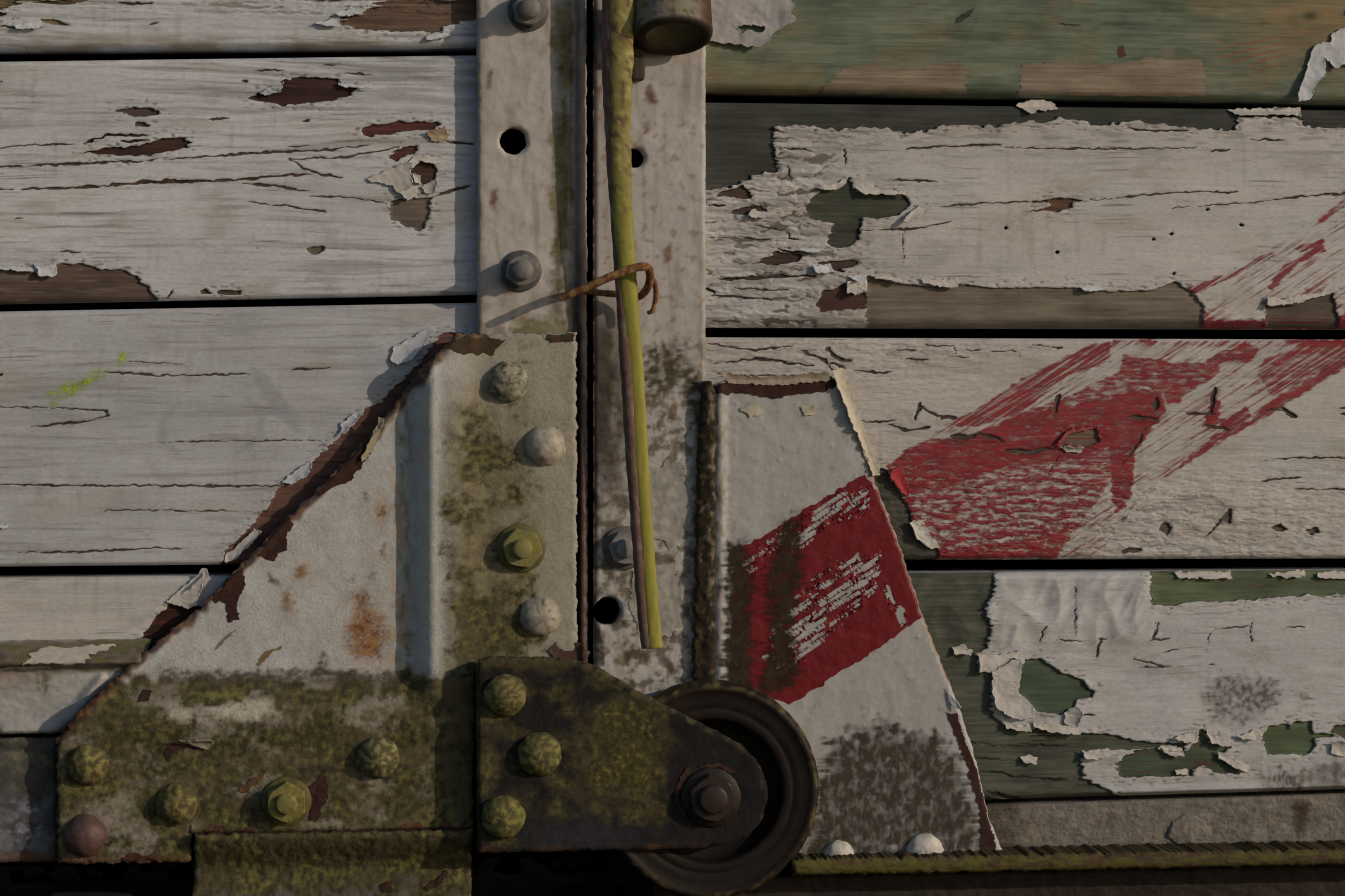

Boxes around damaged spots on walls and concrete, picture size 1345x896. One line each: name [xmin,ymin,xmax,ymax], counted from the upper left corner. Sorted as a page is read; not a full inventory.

peeling [248,76,371,106]
peeling [705,28,1345,218]
peeling [705,177,1205,329]
peeling [0,263,173,304]
crack [108,361,250,377]
crack [0,373,110,427]
crack [0,483,309,512]
peeling [142,327,463,648]
crack [1263,456,1345,491]
crack [20,546,186,554]
corrosion [350,594,384,658]
peeling [868,465,1345,800]